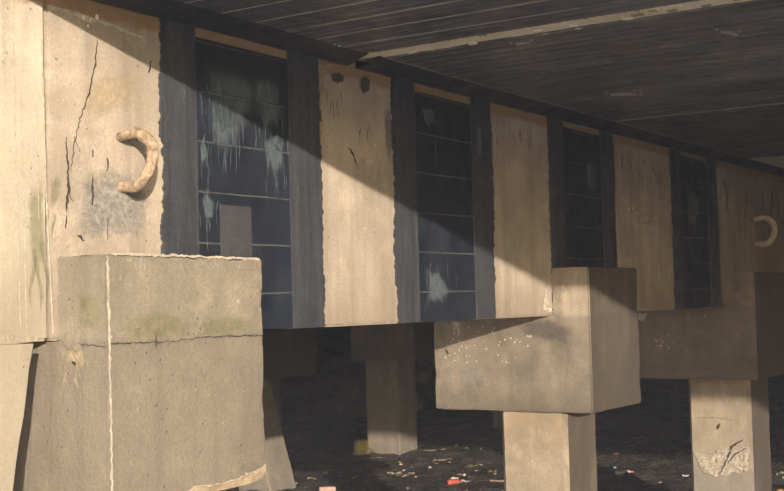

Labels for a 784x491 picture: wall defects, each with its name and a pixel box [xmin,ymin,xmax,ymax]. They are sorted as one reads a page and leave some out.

crack [65,40,109,241]
leakage [199,61,289,194]
leakage [200,194,218,246]
leakage [429,265,447,299]
peeling [693,446,750,477]
crack [720,440,746,474]